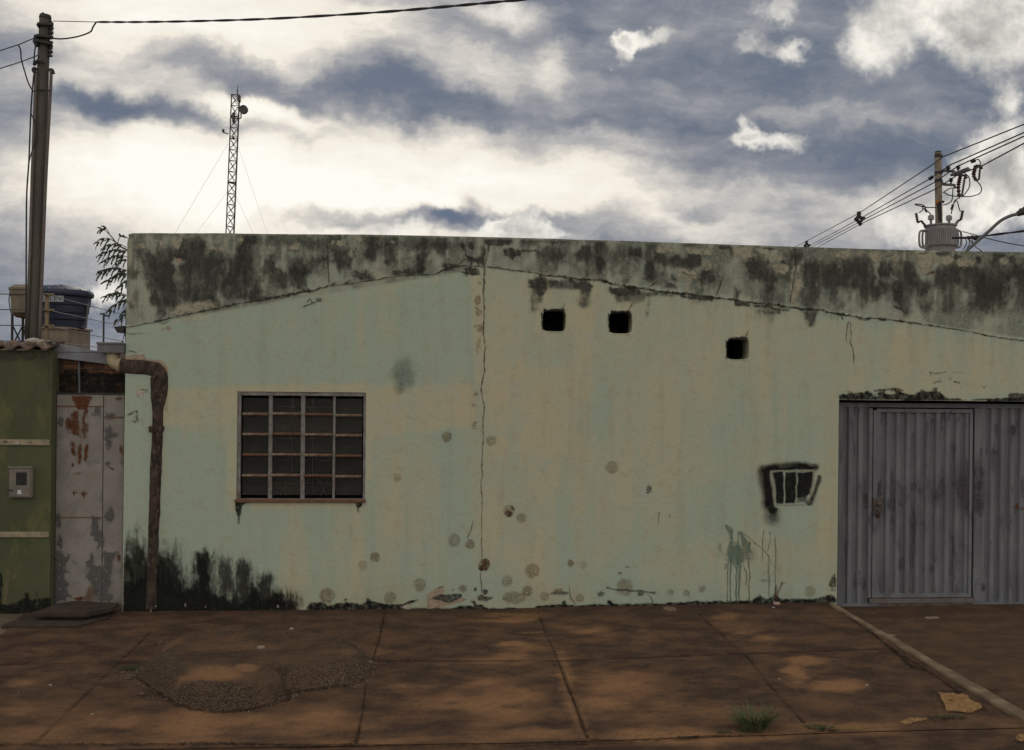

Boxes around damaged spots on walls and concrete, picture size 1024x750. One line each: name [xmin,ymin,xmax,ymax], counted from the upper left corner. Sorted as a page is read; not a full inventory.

damp [138,236,566,312]
damp [735,248,1024,326]
crack [126,243,1024,593]
peeling [55,514,72,602]
peeling [86,507,125,602]
damp [123,544,512,612]
peeling [426,586,466,608]
damp [536,525,836,608]